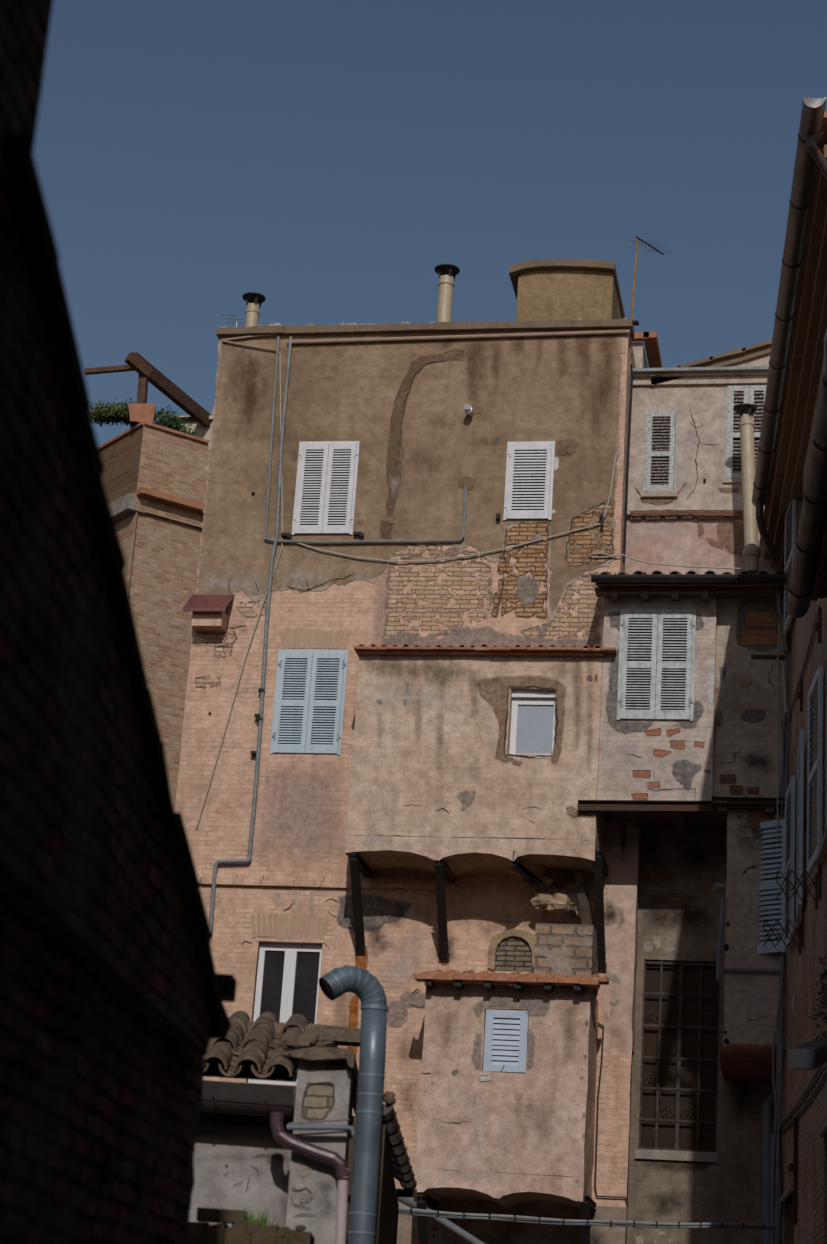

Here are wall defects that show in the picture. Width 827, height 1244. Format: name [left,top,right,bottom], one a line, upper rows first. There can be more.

crack [545,385,716,615]
spalling [630,497,743,516]
spalling [381,502,615,644]
crack [492,529,507,618]
spalling [631,770,660,800]
spalling [644,728,777,828]